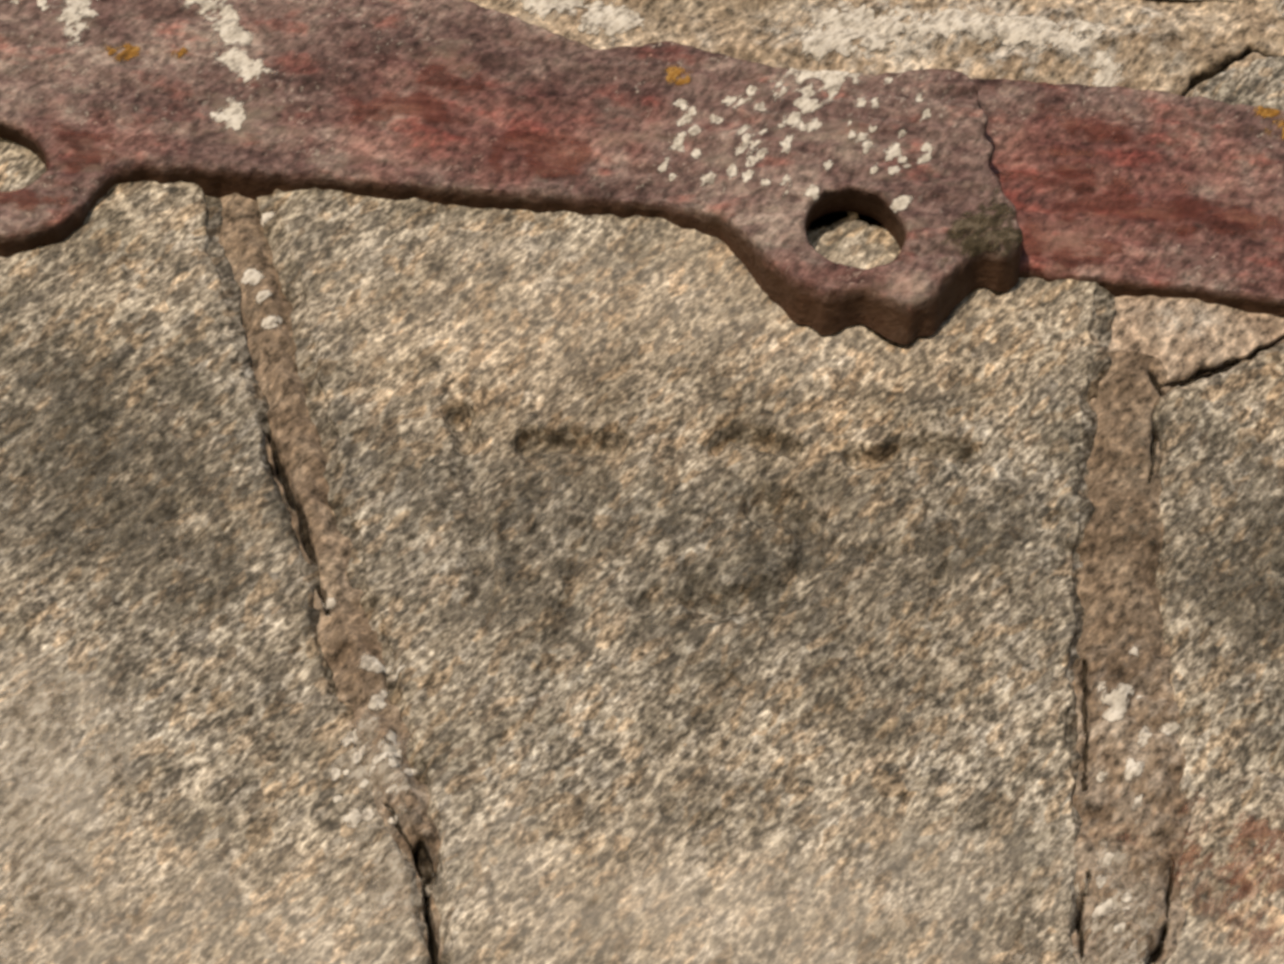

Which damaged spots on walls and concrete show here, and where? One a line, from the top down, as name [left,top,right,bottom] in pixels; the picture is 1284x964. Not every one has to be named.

crack [1148,337,1284,483]
crack [267,437,330,616]
crack [1081,659,1089,792]
crack [384,803,438,964]
crack [1075,872,1091,964]
crack [1146,858,1175,964]